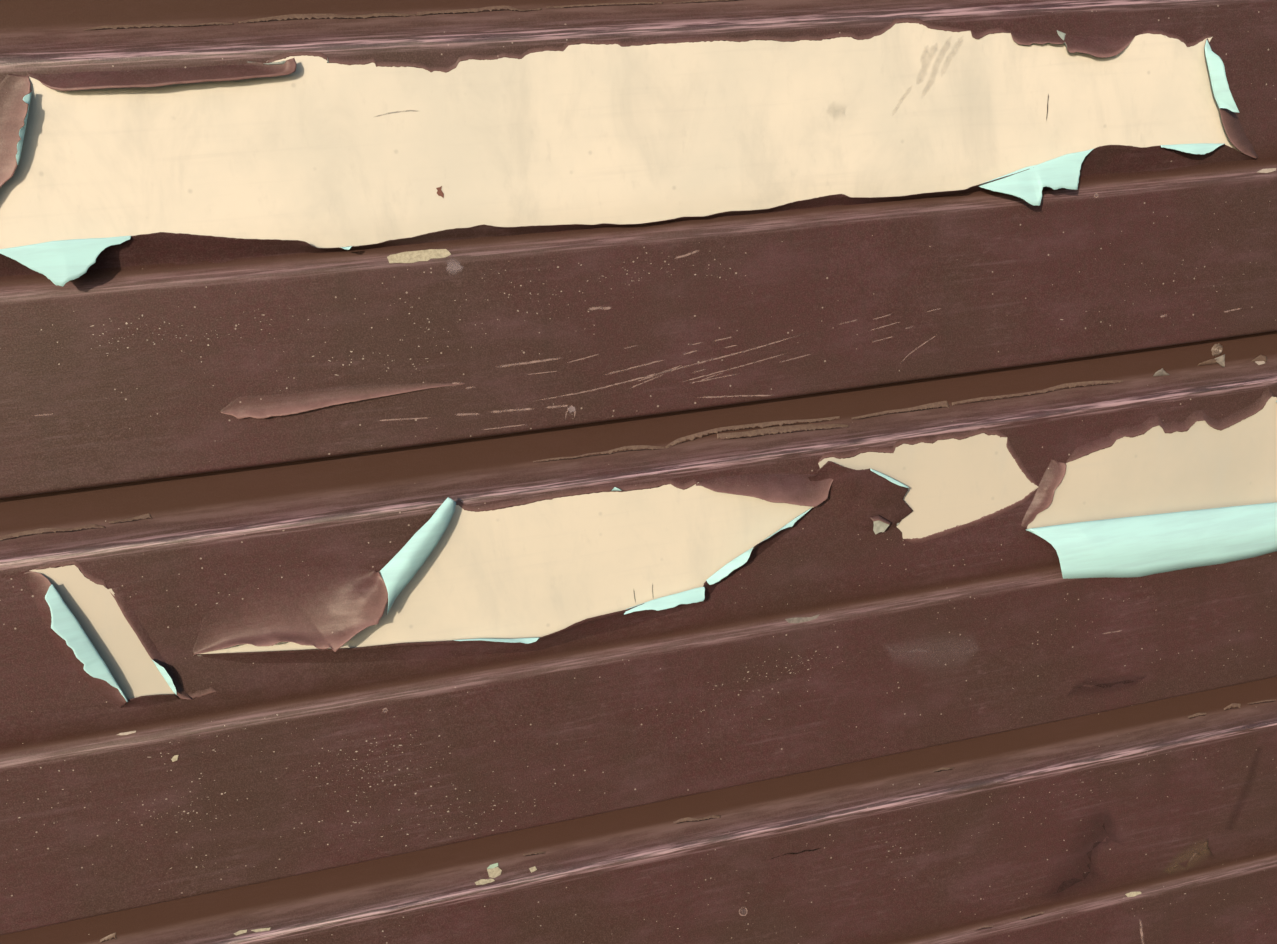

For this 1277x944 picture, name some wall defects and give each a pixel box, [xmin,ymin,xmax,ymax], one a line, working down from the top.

peeling [0,17,1276,286]
peeling [24,560,216,708]
peeling [192,380,1277,663]